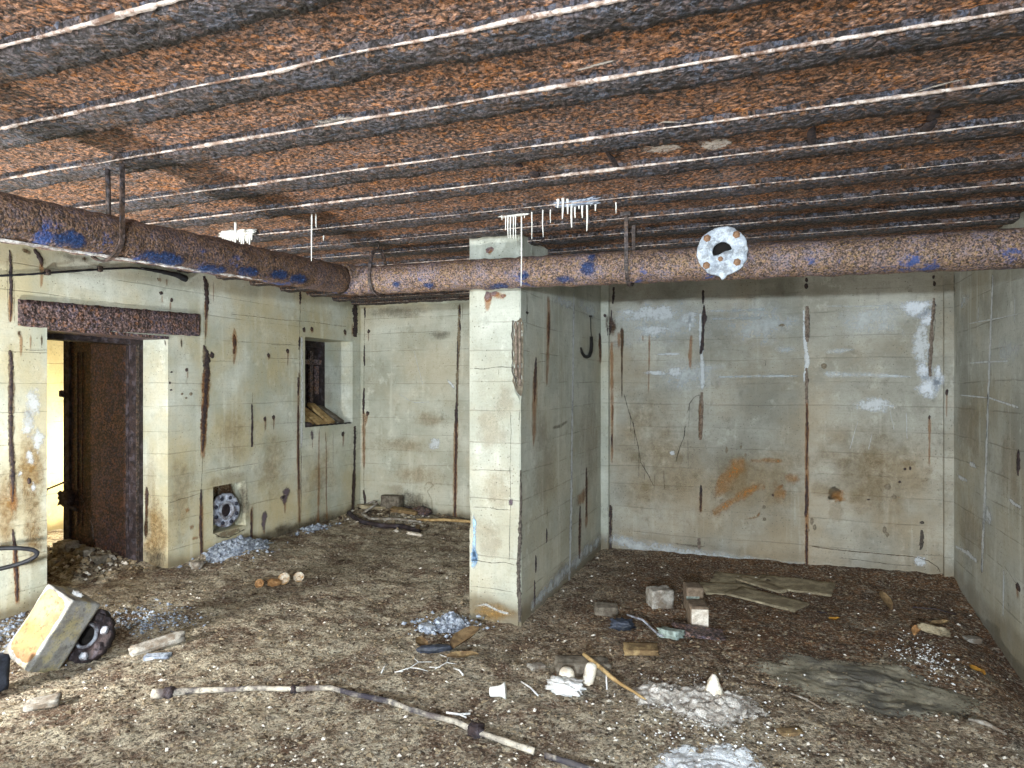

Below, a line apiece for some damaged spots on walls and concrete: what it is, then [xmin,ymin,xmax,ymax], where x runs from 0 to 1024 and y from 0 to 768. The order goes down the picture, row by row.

damp [75,78,1024,238]
damp [271,182,1024,266]
rust [484,291,506,302]
spalling [511,318,524,396]
damp [901,301,943,398]
crack [624,396,665,489]